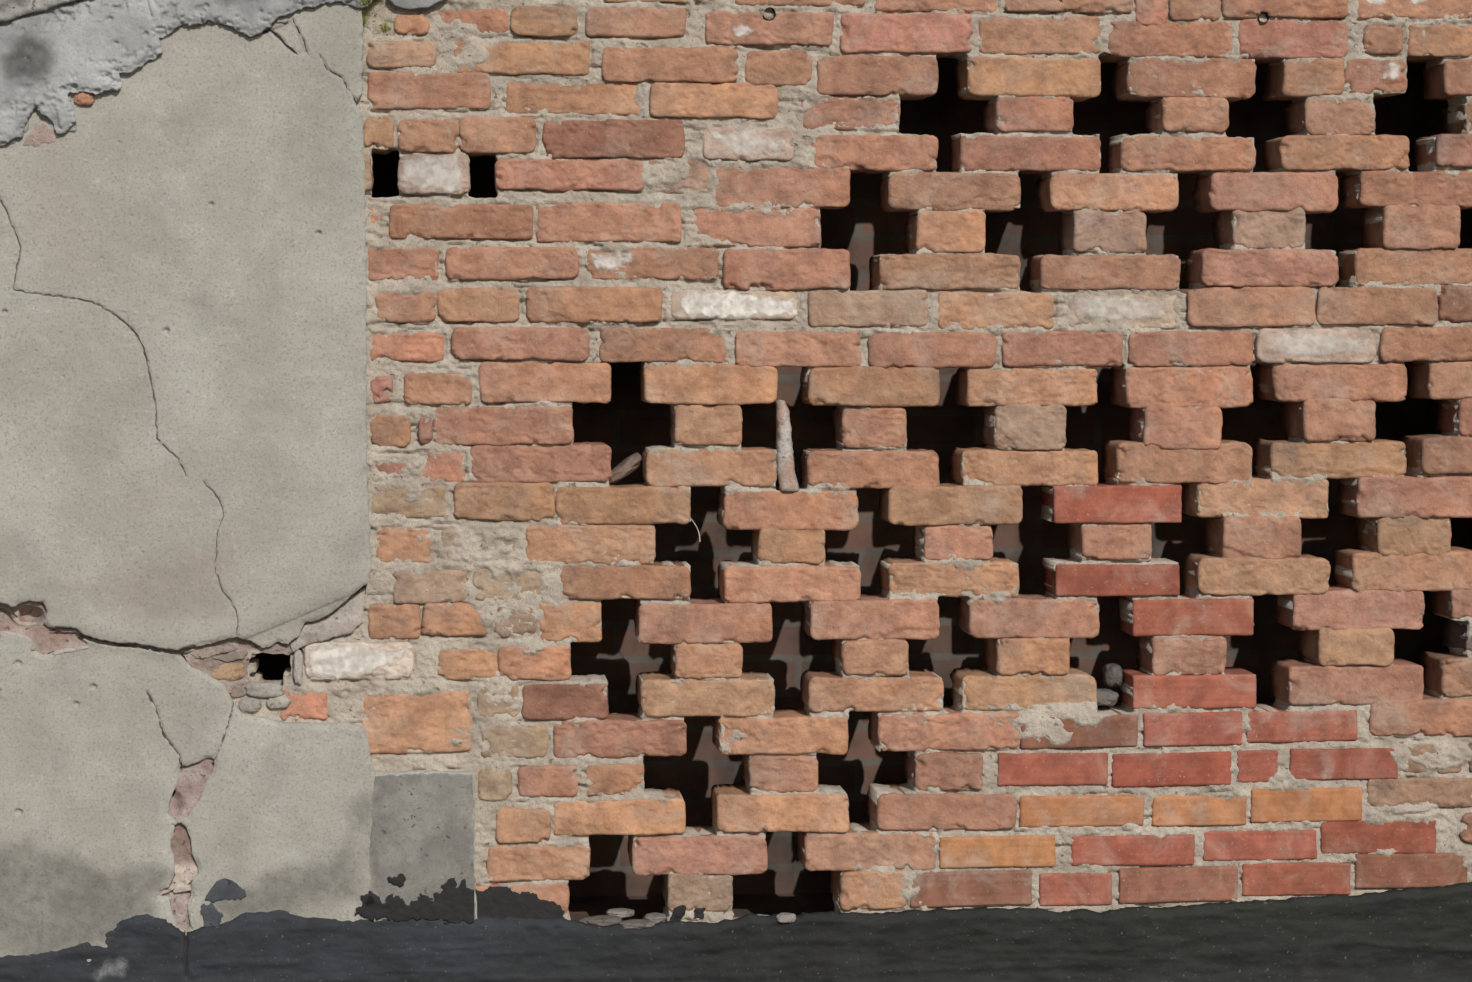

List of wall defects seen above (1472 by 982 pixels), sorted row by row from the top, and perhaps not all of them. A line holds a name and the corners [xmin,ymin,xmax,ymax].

peeling [389,0,443,10]
crack [262,20,357,103]
spalling [8,91,113,147]
crack [0,198,239,630]
spalling [0,601,88,656]
crack [0,603,194,654]
spalling [181,587,365,712]
crack [146,691,234,769]
spalling [158,758,247,931]